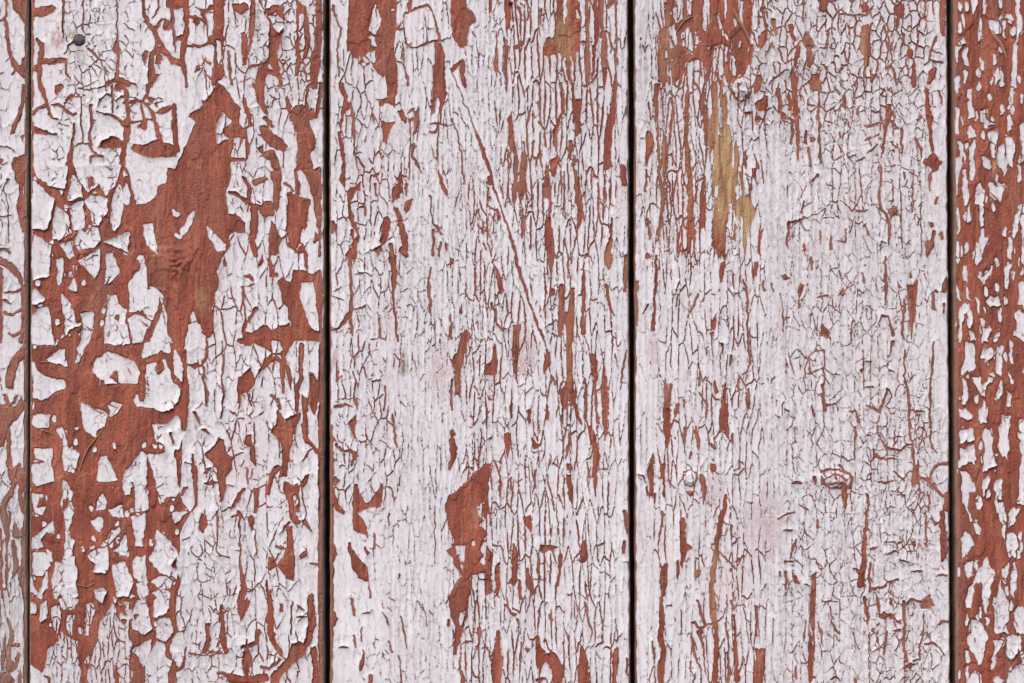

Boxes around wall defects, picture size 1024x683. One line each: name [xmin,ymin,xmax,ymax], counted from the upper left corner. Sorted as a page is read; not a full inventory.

peeling [0,0,414,683]
crack [331,256,403,453]
crack [339,585,432,683]
crack [331,4,471,344]
peeling [428,0,480,125]
peeling [440,0,628,683]
crack [486,0,623,346]
crack [506,371,612,506]
crack [462,537,656,676]
peeling [642,0,806,337]
crack [635,0,949,683]
peeling [897,0,1024,683]